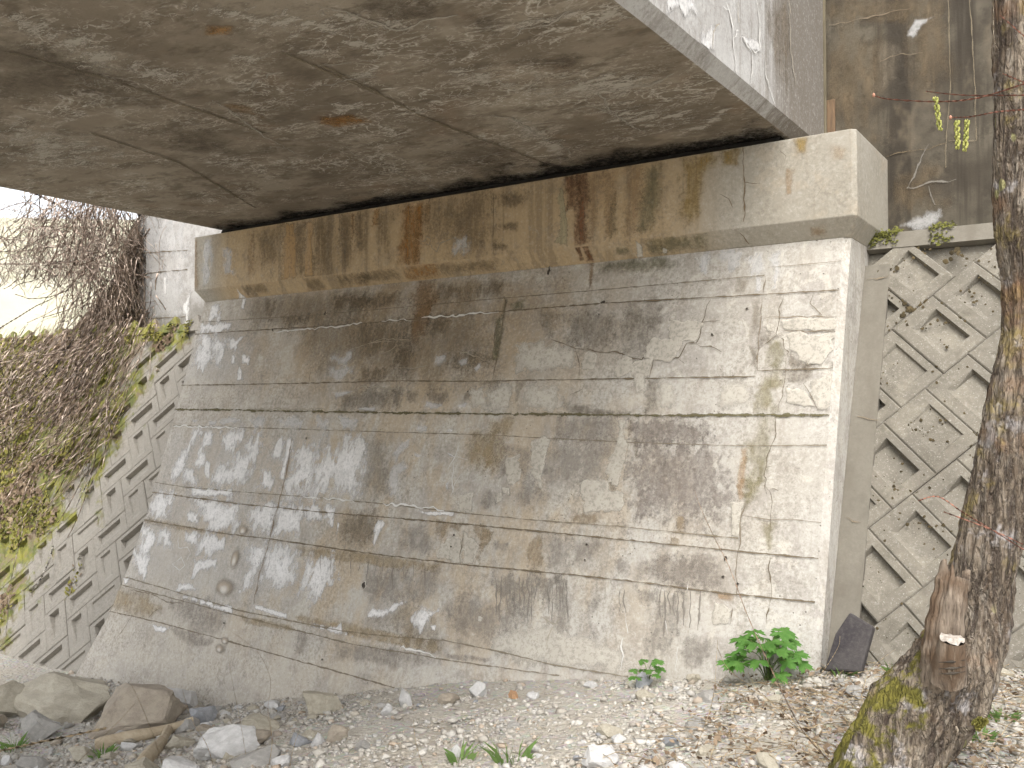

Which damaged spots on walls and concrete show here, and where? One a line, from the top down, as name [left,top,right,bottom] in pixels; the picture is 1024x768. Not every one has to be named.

damp [1,13,216,83]
damp [179,3,437,64]
damp [701,0,775,103]
damp [214,66,785,272]
crack [724,151,757,244]
crack [551,301,721,395]
damp [255,605,287,618]
damp [124,424,426,613]
damp [368,602,406,617]
damp [411,608,439,634]
damp [659,590,701,637]
crack [730,506,745,624]